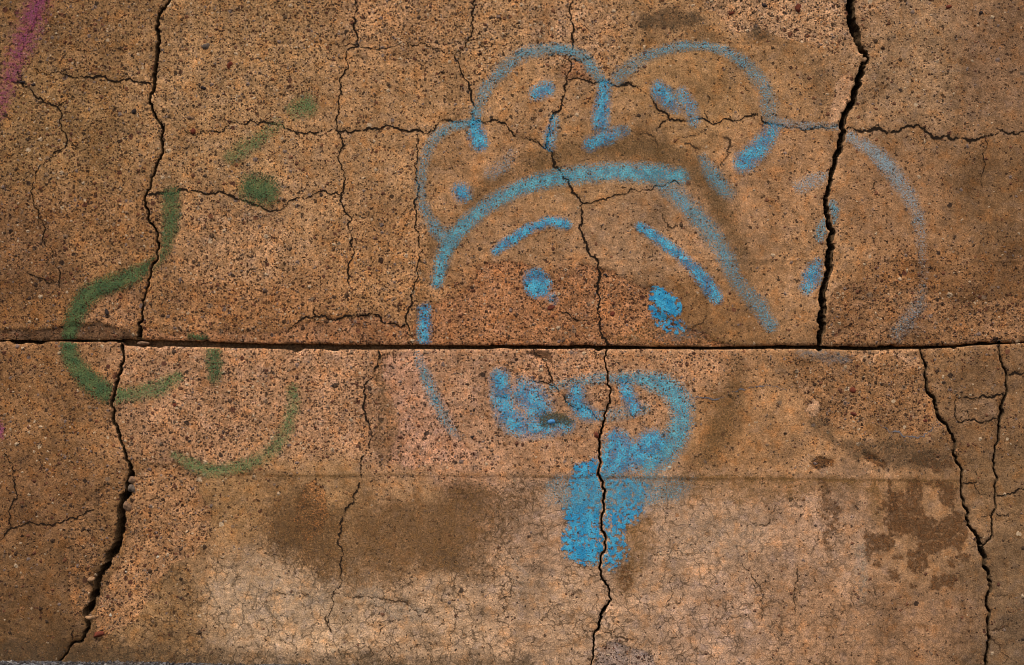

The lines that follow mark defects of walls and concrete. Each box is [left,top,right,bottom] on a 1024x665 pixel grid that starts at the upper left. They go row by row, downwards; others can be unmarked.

crack [0,0,77,317]
crack [32,0,516,345]
crack [524,0,1024,665]
crack [0,453,94,540]
crack [54,343,138,662]
crack [279,350,439,658]
water stain [264,486,539,588]